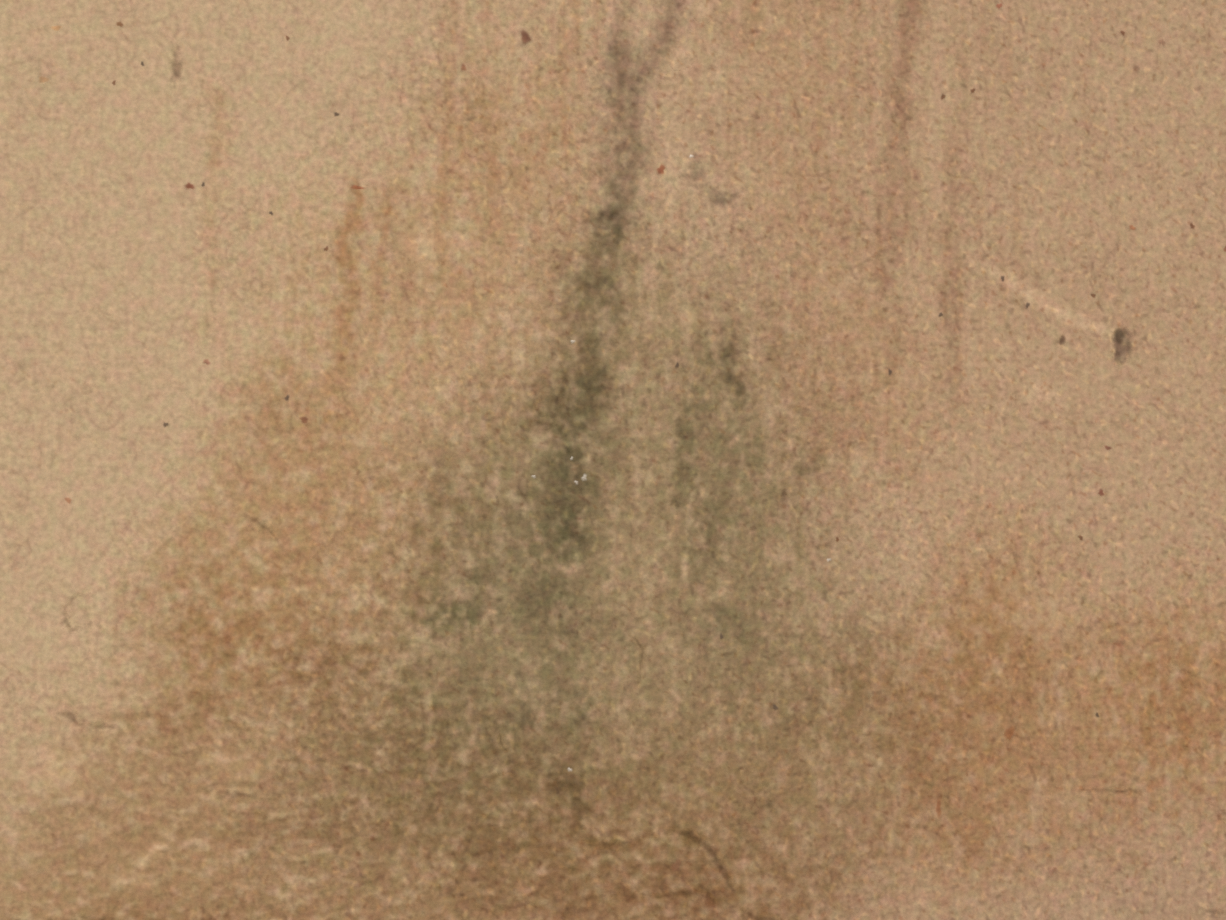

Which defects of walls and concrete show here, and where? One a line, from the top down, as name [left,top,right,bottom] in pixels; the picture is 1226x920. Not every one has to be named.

water stain [77,0,981,833]
water stain [104,799,235,857]
corrosion [918,478,1226,920]